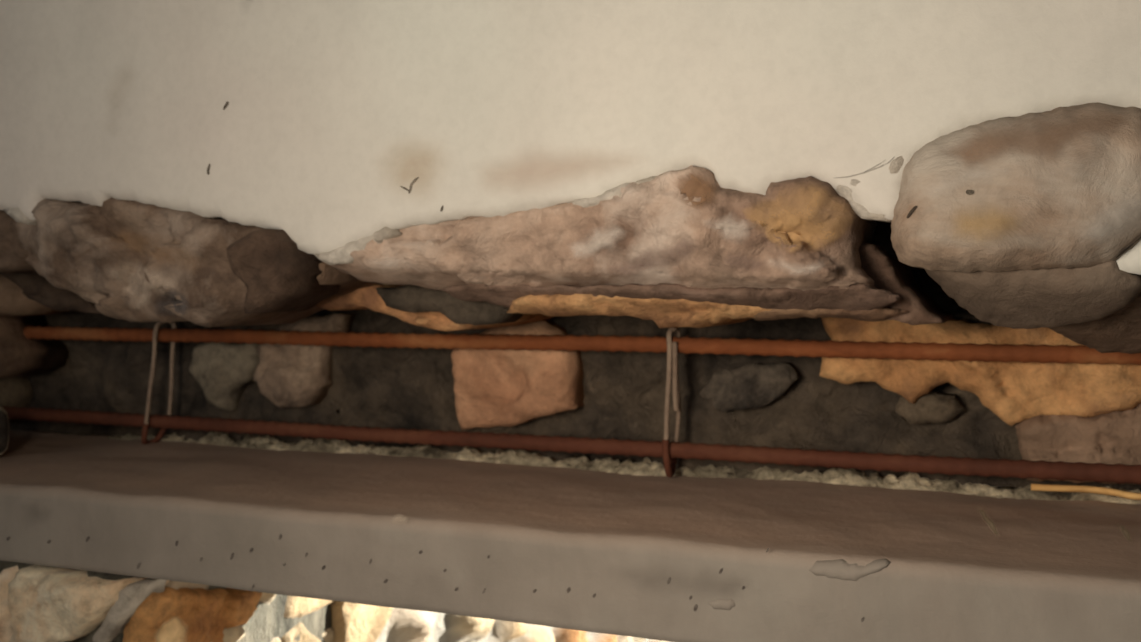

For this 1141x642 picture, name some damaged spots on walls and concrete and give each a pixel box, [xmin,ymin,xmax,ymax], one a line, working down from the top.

flaking render [889,156,904,174]
flaking render [4,207,37,225]
flaking render [567,176,656,208]
flaking render [835,179,892,223]
flaking render [314,226,402,265]
spalling [23,326,1141,365]
spalling [3,406,1141,485]